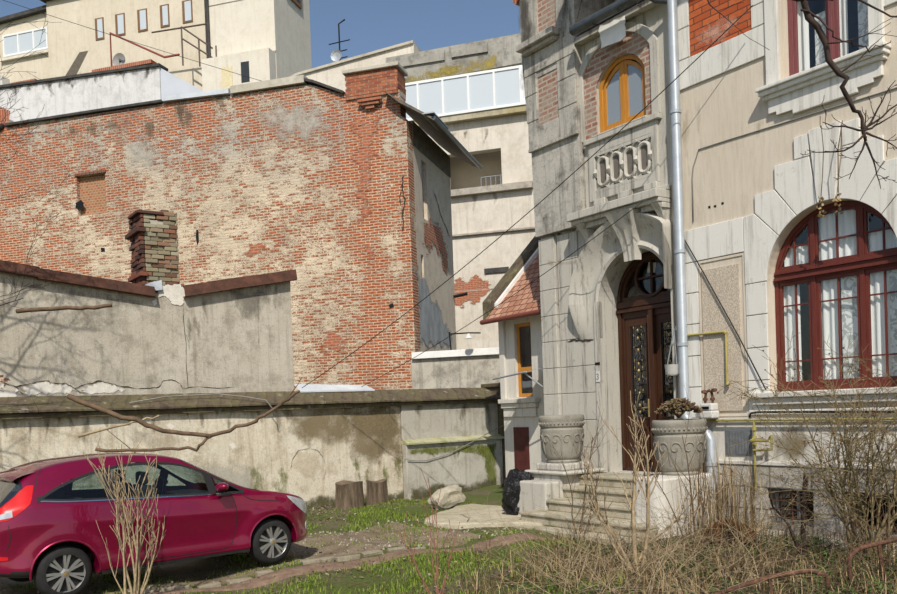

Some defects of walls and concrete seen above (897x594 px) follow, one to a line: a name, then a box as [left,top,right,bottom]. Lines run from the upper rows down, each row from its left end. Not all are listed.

crack [398,176,406,231]
flaking render [244,242,279,258]
flaking render [422,218,490,308]
spalling [152,284,185,306]
spalling [0,375,125,397]
leakage [288,406,402,478]
leakage [412,444,496,484]